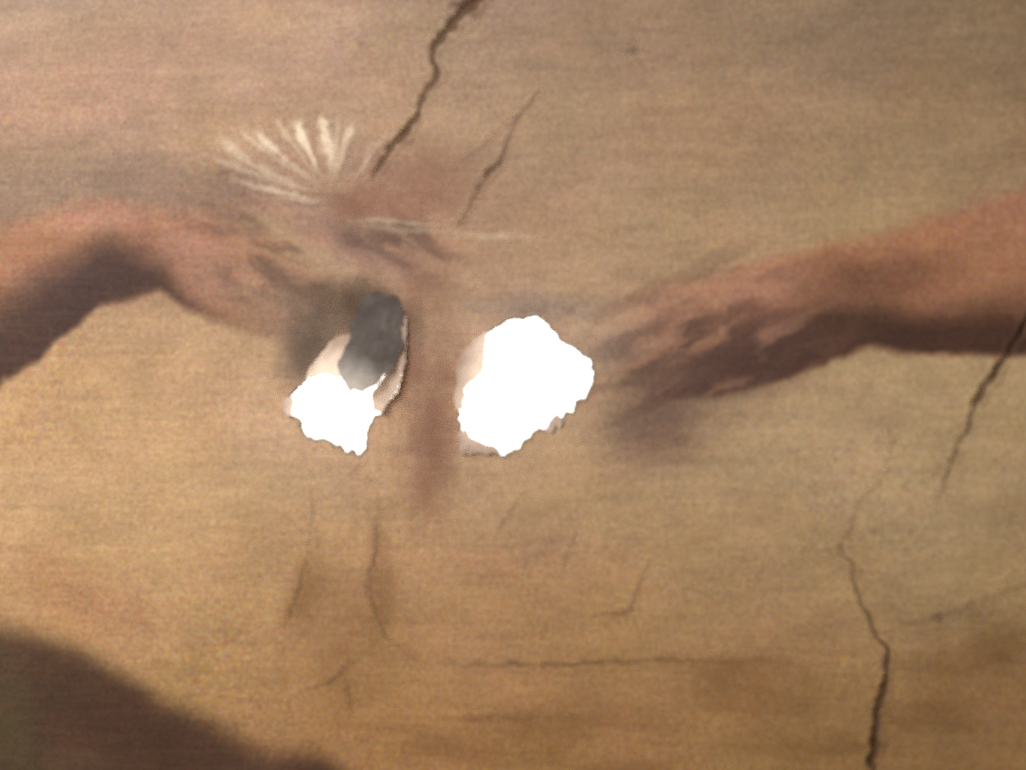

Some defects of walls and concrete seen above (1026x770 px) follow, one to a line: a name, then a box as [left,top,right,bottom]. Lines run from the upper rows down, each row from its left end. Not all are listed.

crack [376,0,482,171]
peeling [305,334,350,379]
peeling [371,314,408,414]
peeling [454,331,487,410]
crack [964,322,1026,435]
peeling [459,429,501,456]
crack [868,614,890,770]